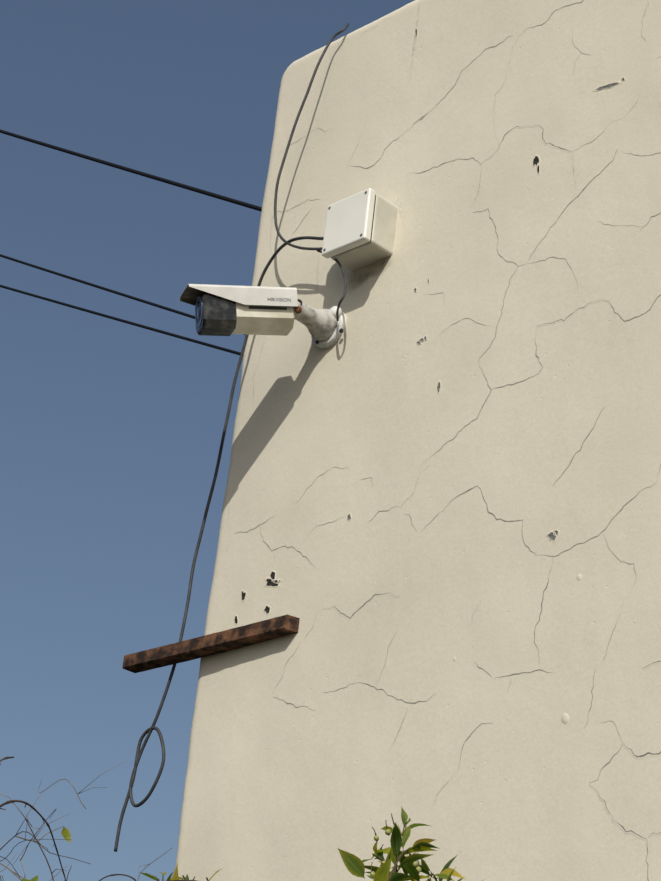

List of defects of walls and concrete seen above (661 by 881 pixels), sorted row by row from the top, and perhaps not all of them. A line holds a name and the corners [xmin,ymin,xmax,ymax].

spalling [591,77,625,92]
spalling [532,154,541,174]
crack [347,36,661,693]
crack [225,516,338,566]
flaking render [546,529,560,542]
spalling [264,570,282,588]
crack [272,593,400,708]
crack [323,627,435,747]
crack [585,622,661,881]